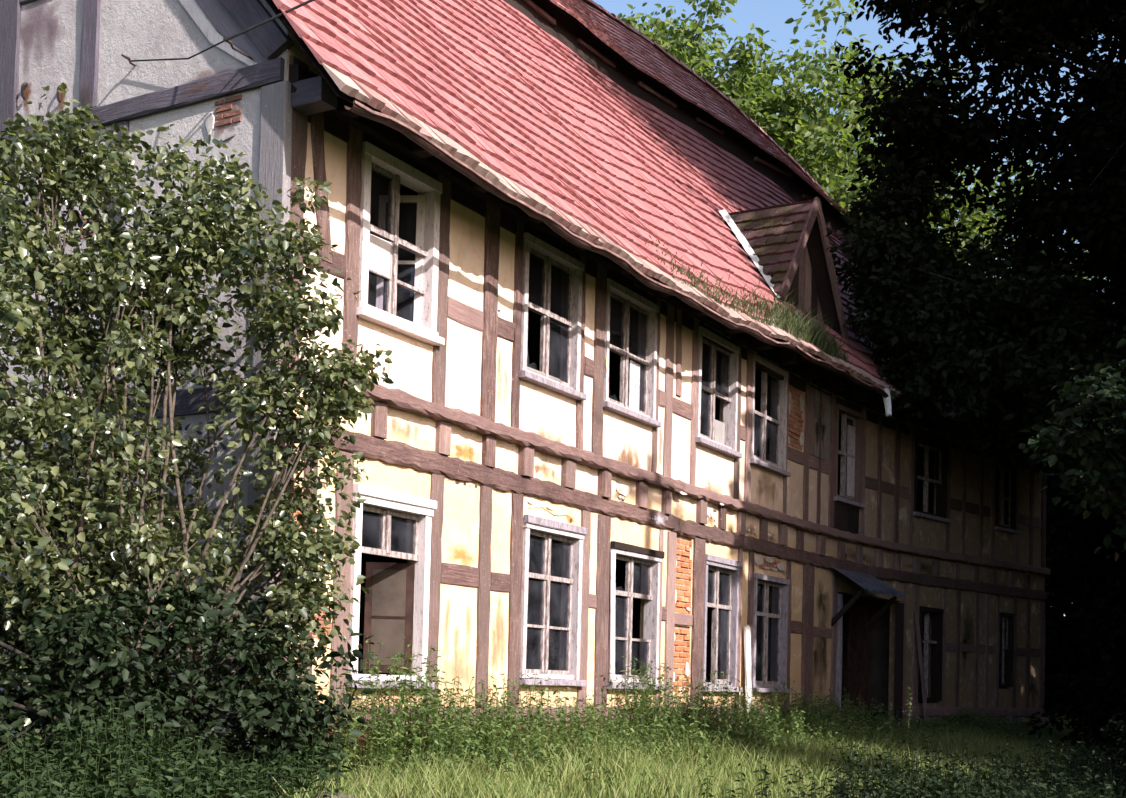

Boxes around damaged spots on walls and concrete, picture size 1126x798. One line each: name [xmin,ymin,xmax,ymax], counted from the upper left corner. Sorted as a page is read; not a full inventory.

spalling [205,94,242,142]
spalling [788,384,804,451]
damp [621,449,639,468]
spalling [673,535,692,692]